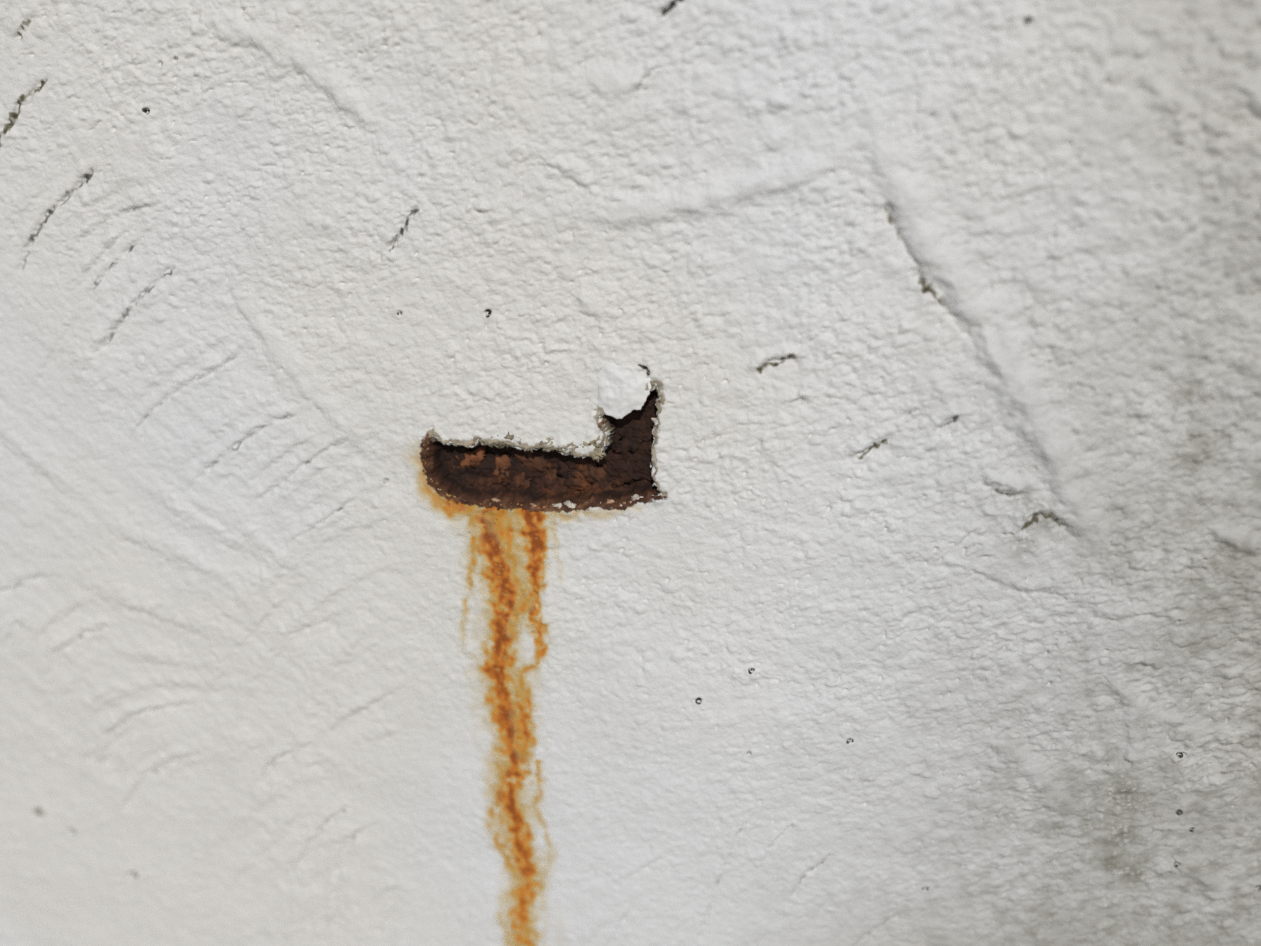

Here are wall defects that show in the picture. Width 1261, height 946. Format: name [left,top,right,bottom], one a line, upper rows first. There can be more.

spalling [419,362,668,513]
rust [419,459,576,946]